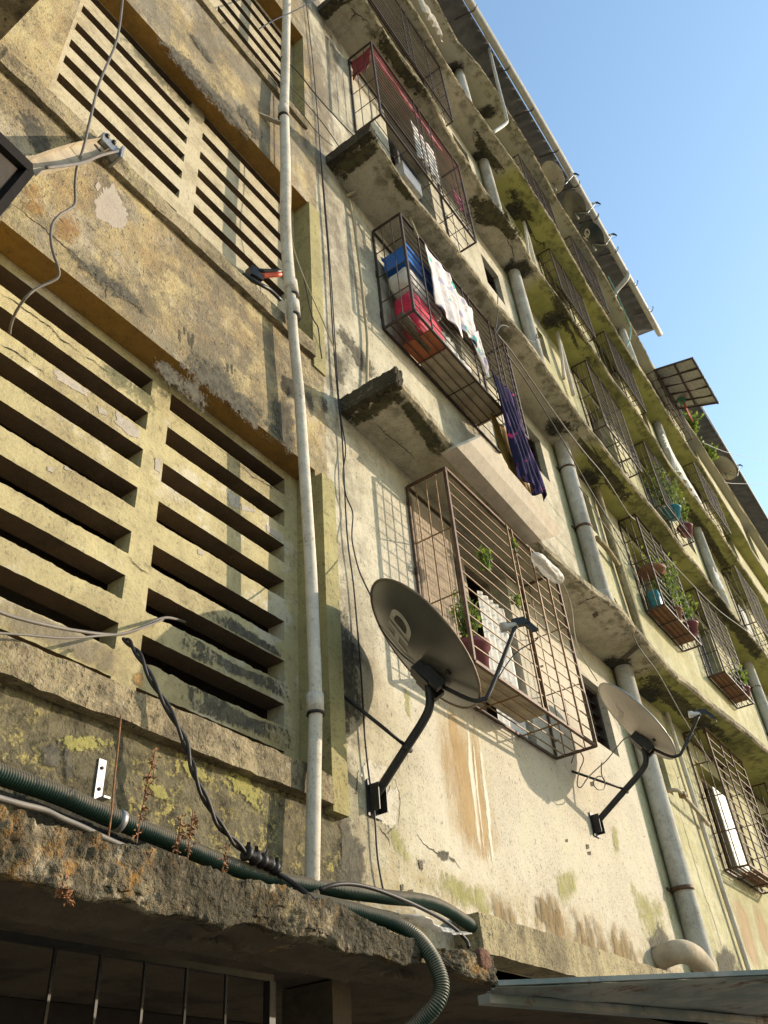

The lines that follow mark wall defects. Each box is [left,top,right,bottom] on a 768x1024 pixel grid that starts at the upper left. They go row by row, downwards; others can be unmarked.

damp [505,203,522,221]
crack [380,779,460,868]
damp [467,731,493,861]
damp [493,896,518,924]
damp [536,895,638,962]